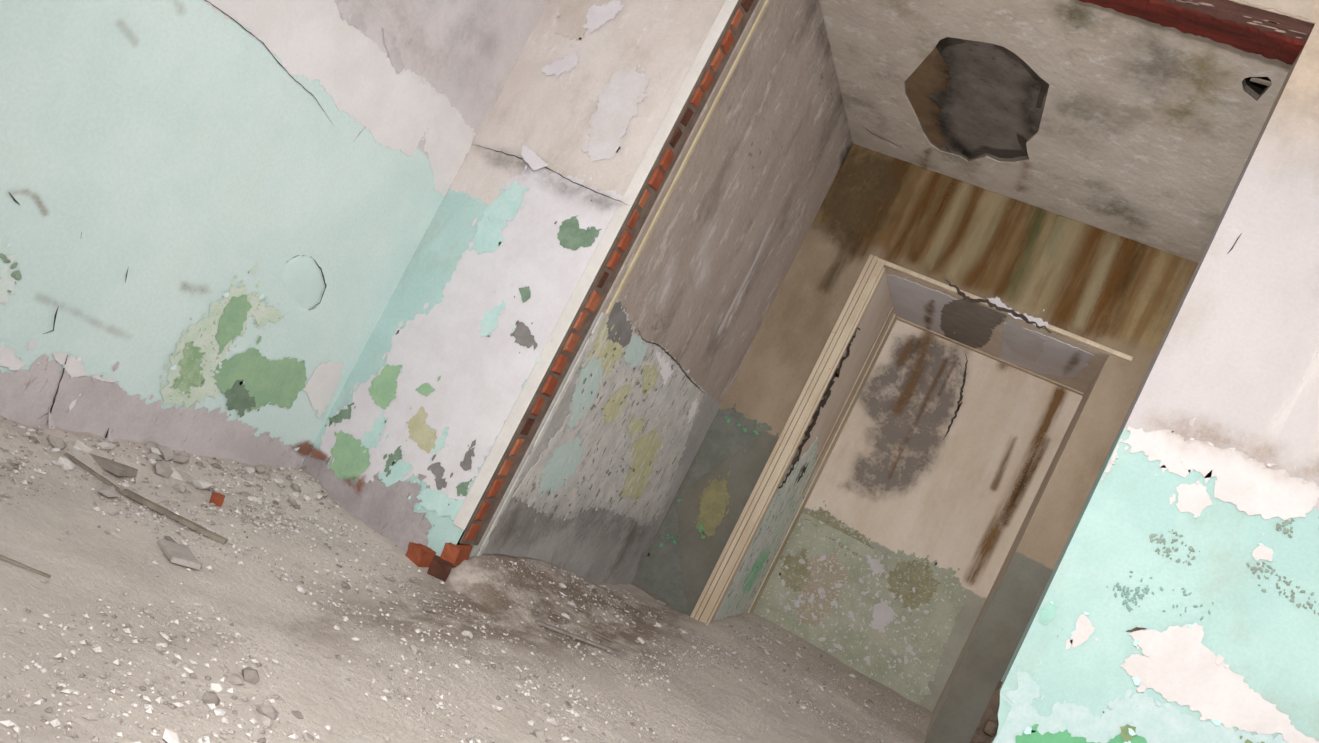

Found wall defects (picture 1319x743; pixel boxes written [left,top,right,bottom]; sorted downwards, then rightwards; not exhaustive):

flaking render [905,37,1049,162]
peeling [0,0,759,582]
crack [945,279,1052,333]
crack [779,327,860,489]
water stain [856,337,960,493]
peeling [713,436,966,706]
peeling [970,571,1319,743]
peeling [1101,418,1319,615]